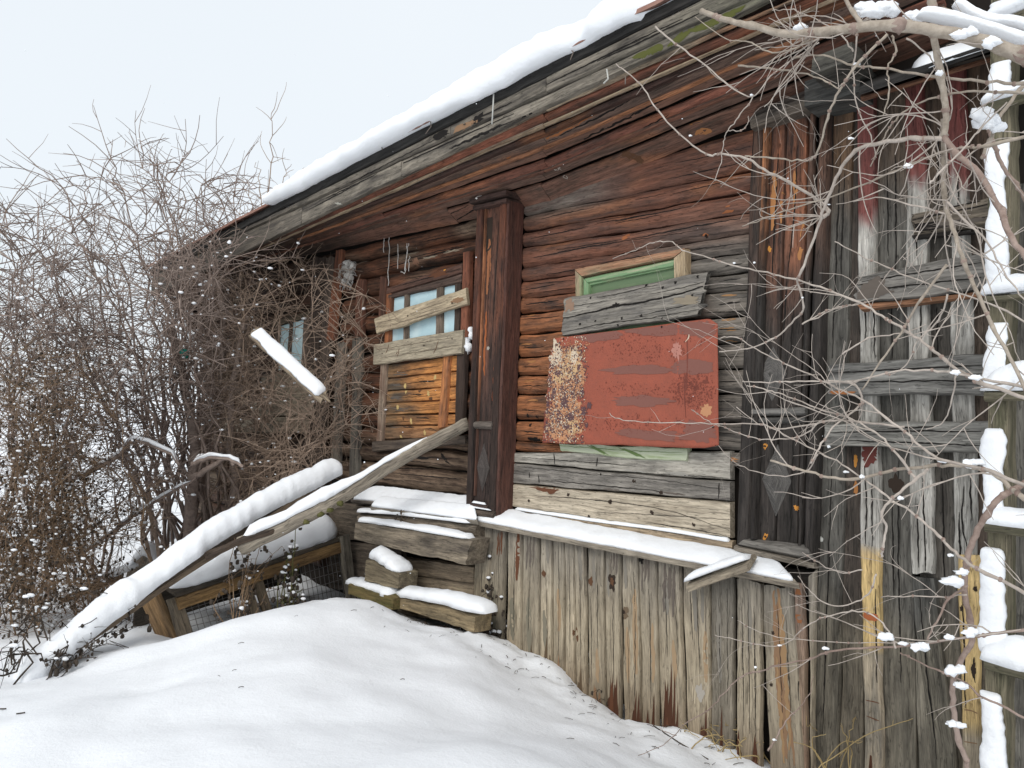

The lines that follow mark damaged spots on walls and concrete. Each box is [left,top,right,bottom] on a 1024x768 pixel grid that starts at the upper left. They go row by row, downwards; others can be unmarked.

crack [310,102,532,209]
corrosion [542,329,716,444]